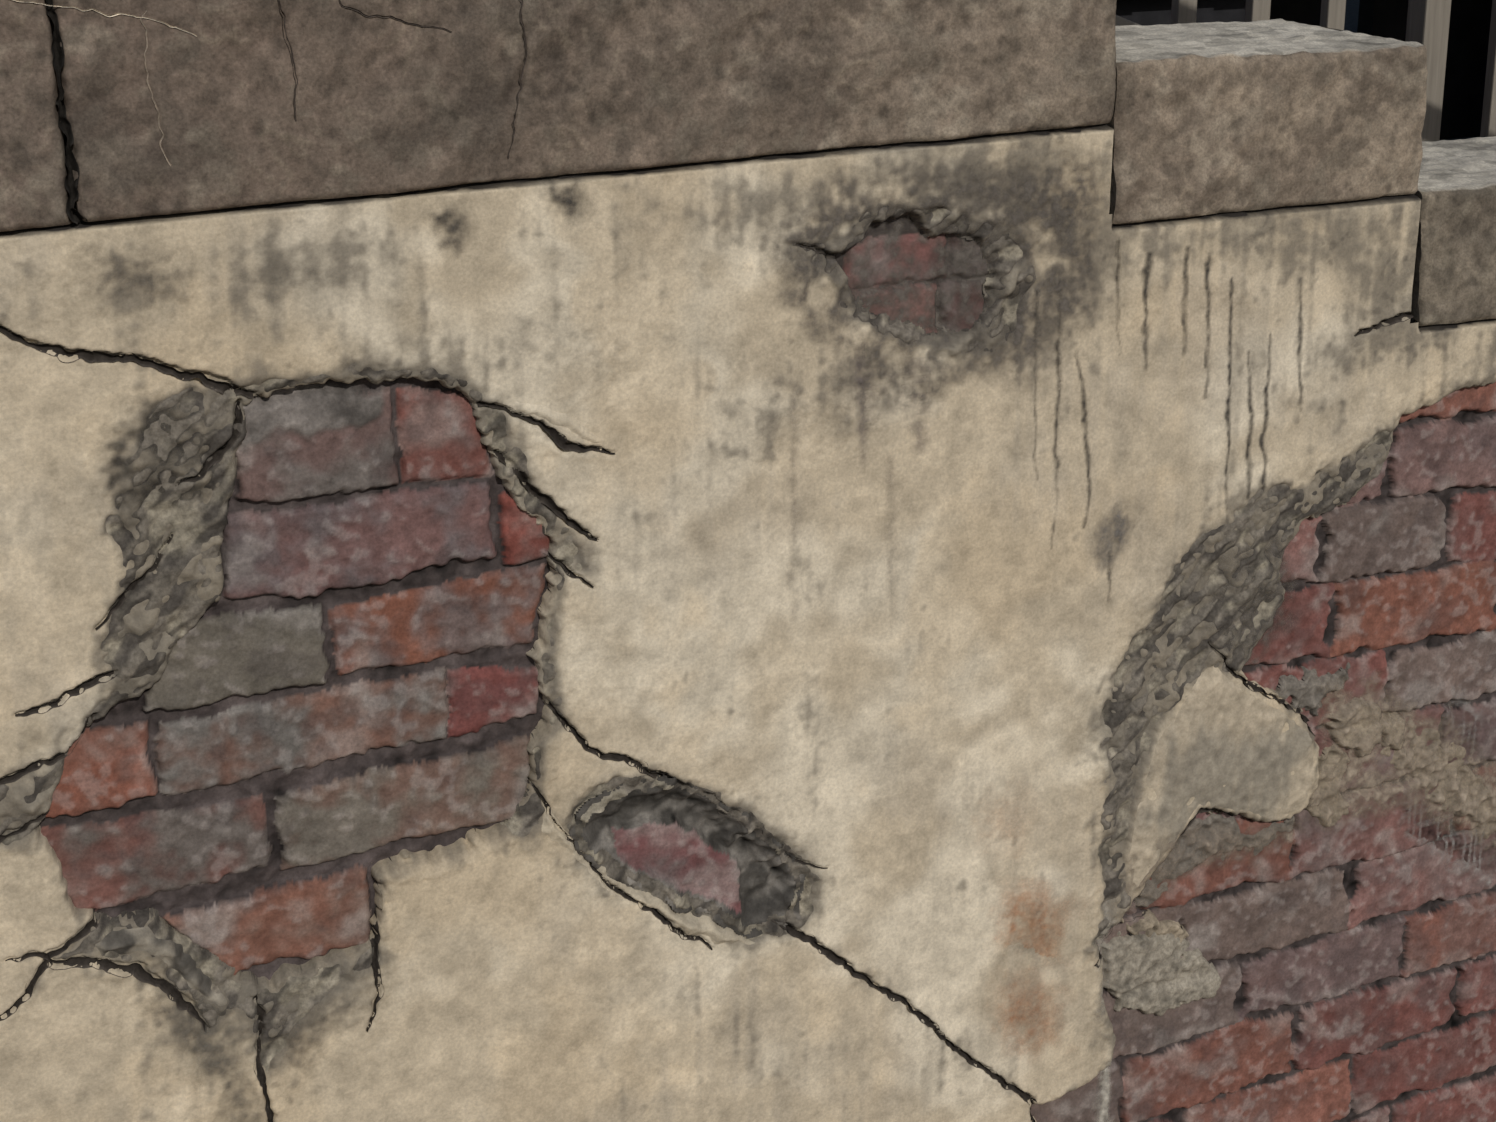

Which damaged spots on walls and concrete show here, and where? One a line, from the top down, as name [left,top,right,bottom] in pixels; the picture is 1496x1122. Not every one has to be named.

crack [14,0,197,224]
crack [278,0,298,121]
flaking render [801,205,1036,353]
crack [0,326,253,485]
leakage [1226,279,1269,498]
flaking render [0,362,605,1073]
flaking render [1030,382,1496,1122]
flaking render [567,772,820,941]
crack [0,909,210,1031]
crack [253,995,274,1122]
crack [366,878,384,1032]
crack [768,912,1037,1122]